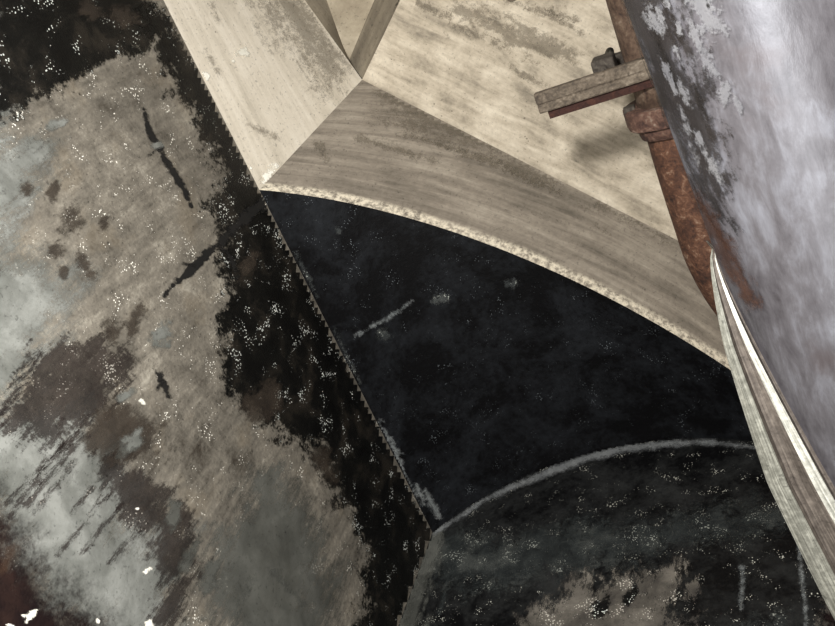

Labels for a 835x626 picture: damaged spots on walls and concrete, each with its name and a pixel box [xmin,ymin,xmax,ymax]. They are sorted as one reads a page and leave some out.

crack [143,108,193,208]
crack [162,195,267,297]
corrosion [692,190,759,304]
leakage [0,136,179,626]
leakage [184,461,350,626]